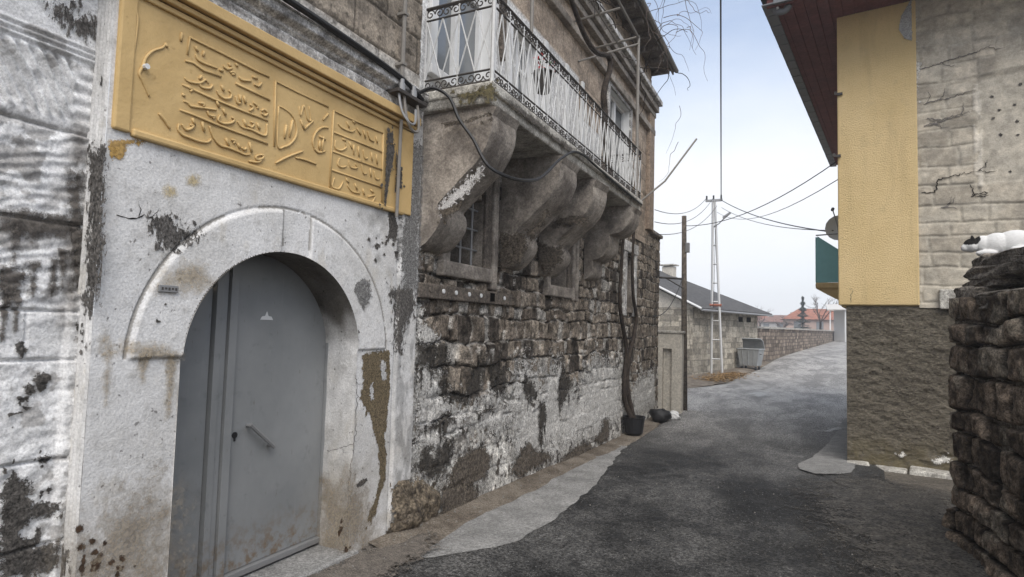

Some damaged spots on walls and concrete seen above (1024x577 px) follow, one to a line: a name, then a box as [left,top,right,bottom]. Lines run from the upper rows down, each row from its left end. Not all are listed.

peeling [43,0,97,45]
crack [922,45,1001,128]
crack [922,162,997,209]
peeling [75,140,109,355]
peeling [146,209,206,254]
flaking render [354,126,424,529]
peeling [8,371,52,428]
damp [414,338,573,483]
spalling [0,451,71,577]